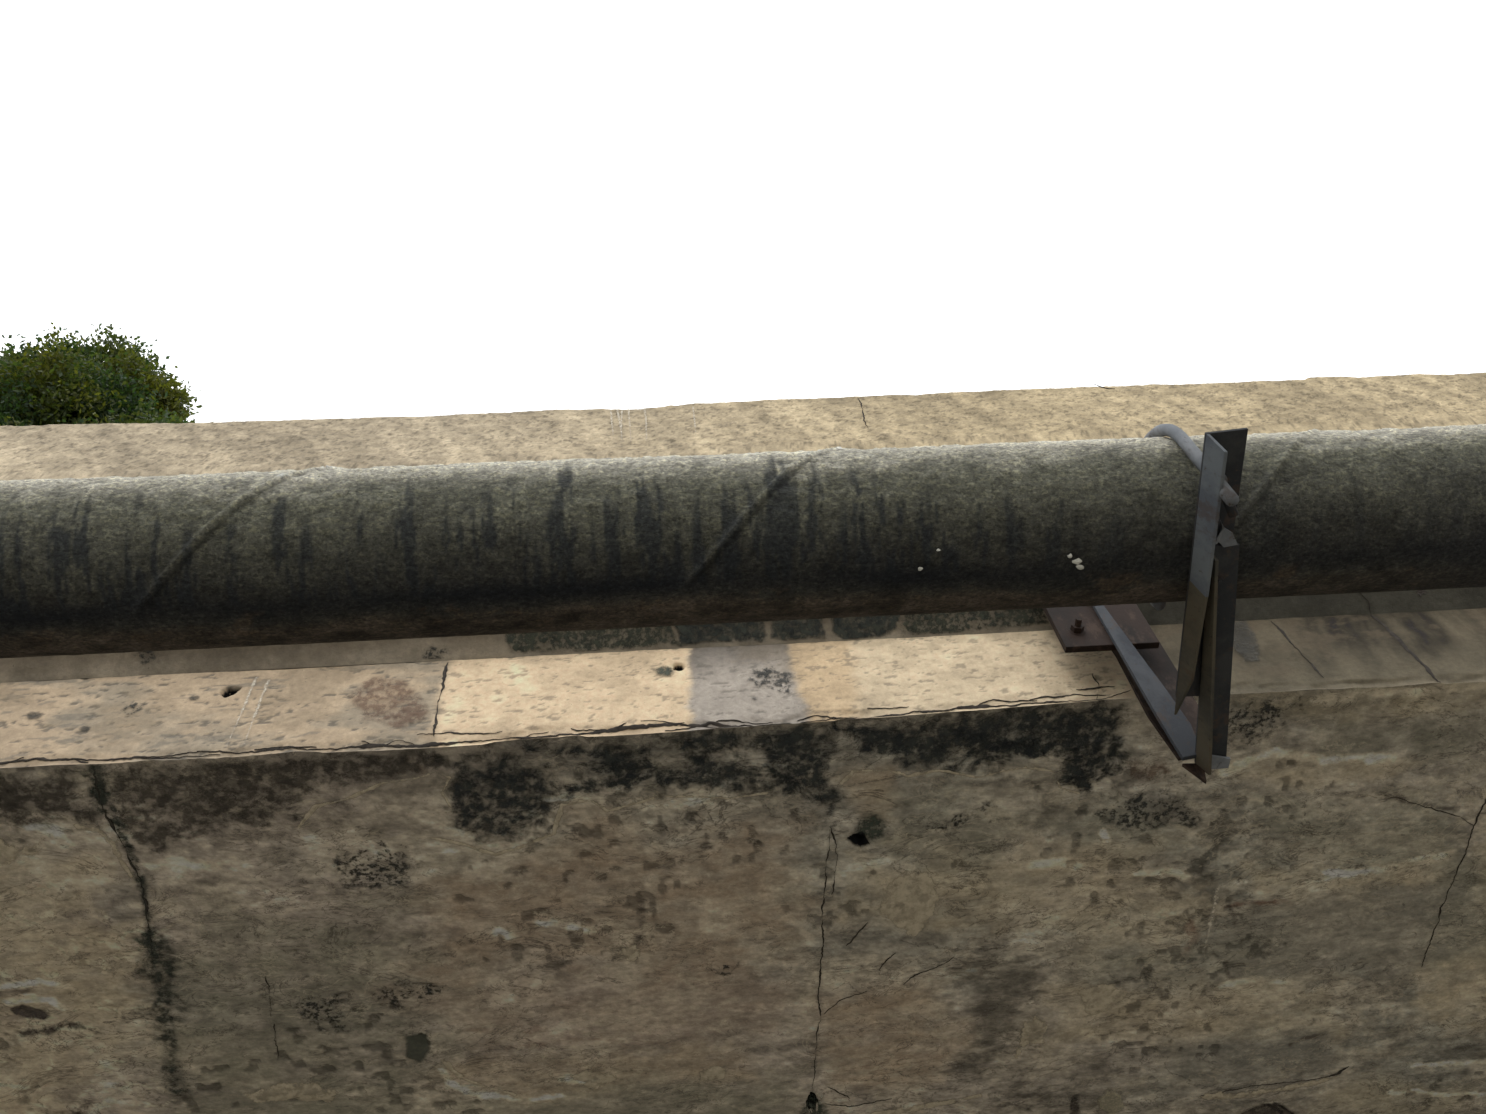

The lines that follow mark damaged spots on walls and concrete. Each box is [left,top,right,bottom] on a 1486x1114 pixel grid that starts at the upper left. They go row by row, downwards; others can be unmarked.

damp [0,703,1128,1102]
crack [0,663,1130,960]
crack [812,827,954,1107]
peeling [1201,1077,1332,1114]
crack [1385,795,1486,966]